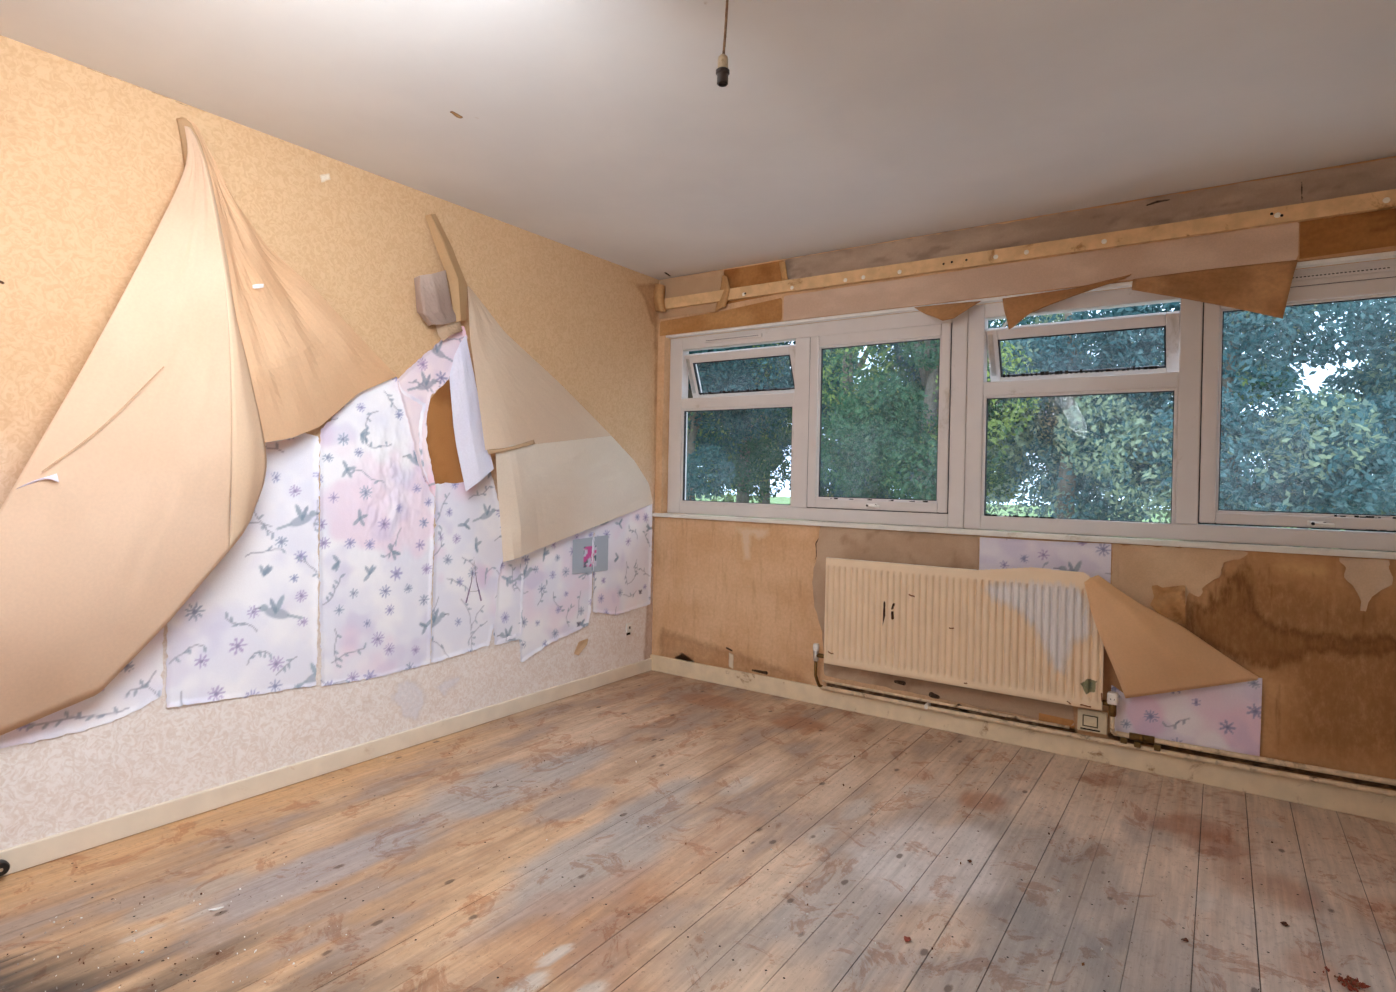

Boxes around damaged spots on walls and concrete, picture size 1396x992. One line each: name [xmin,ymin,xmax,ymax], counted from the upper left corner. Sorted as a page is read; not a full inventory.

peeling [425,214,467,322]
flaking render [426,376,464,484]
peeling [574,639,588,655]
peeling [1084,575,1259,698]
leakage [1178,550,1396,791]